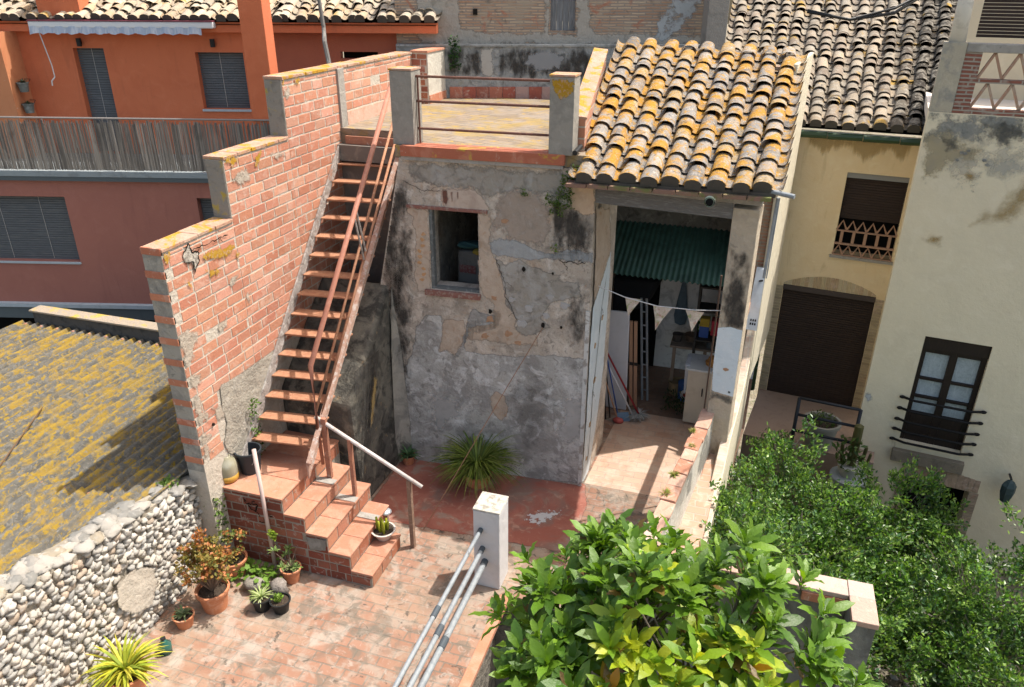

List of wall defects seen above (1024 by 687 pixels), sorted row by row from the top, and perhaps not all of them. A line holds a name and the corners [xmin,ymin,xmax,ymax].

leakage [448,48,590,77]
leakage [923,112,1024,178]
flaking render [570,187,595,215]
crack [183,235,227,273]
leakage [385,189,412,373]
spalling [440,189,581,354]
leakage [570,301,583,339]